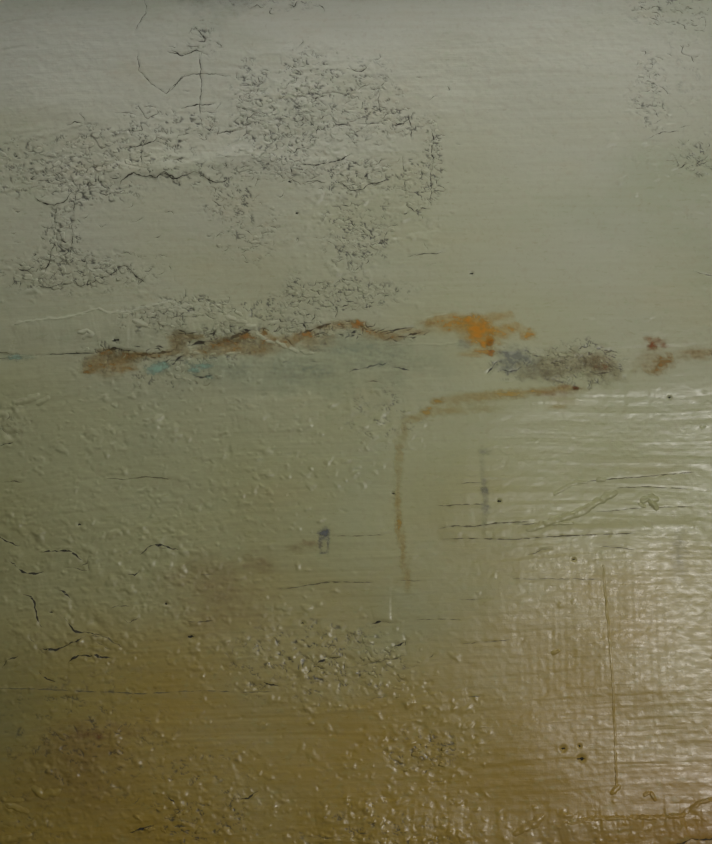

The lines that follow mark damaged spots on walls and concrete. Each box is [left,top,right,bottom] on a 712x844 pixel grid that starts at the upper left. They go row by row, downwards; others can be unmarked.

crack [97,28,242,196]
crack [18,192,144,288]
peeling [76,313,428,374]
corrosion [437,315,514,356]
corrosion [648,340,672,373]